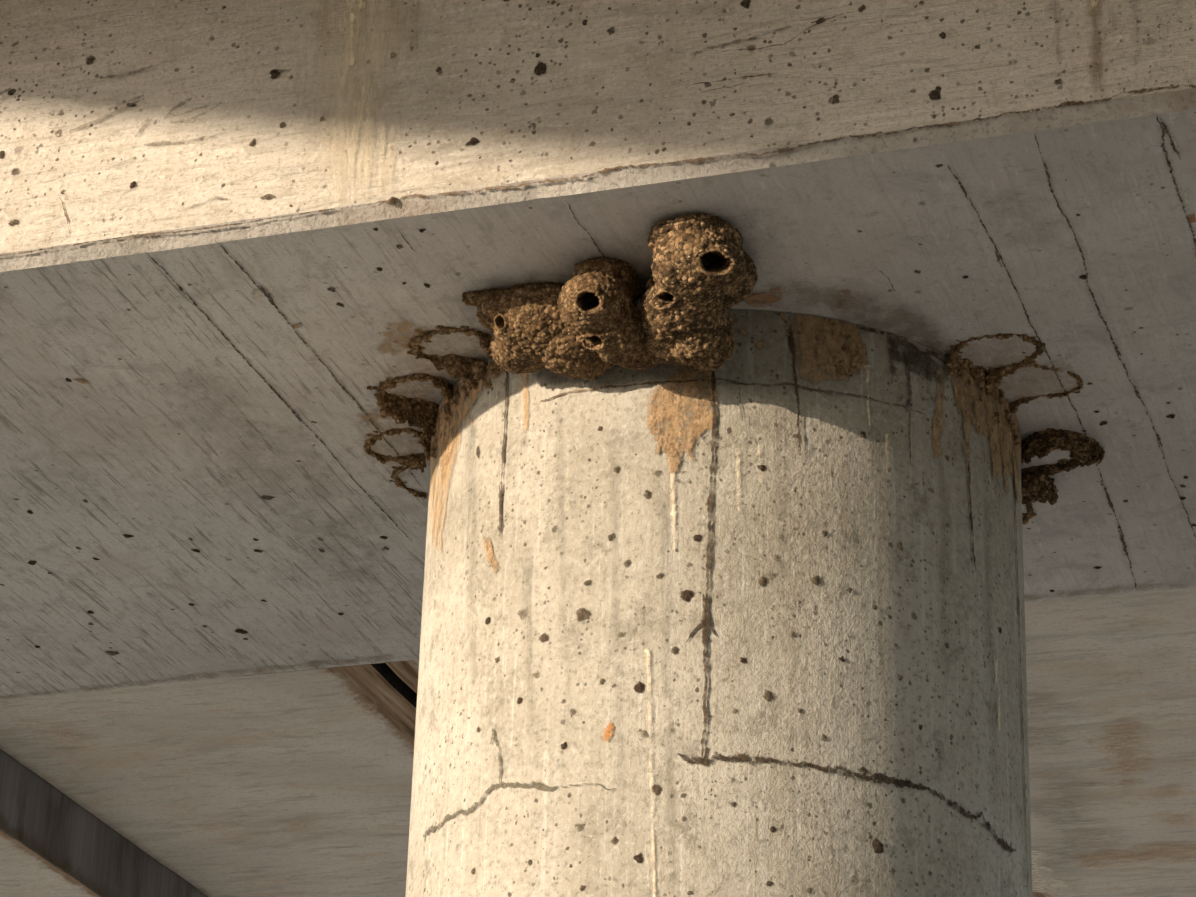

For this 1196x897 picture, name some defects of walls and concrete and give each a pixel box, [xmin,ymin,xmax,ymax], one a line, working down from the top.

crack [366,84,1196,590]
crack [423,725,615,837]
crack [540,312,1028,881]